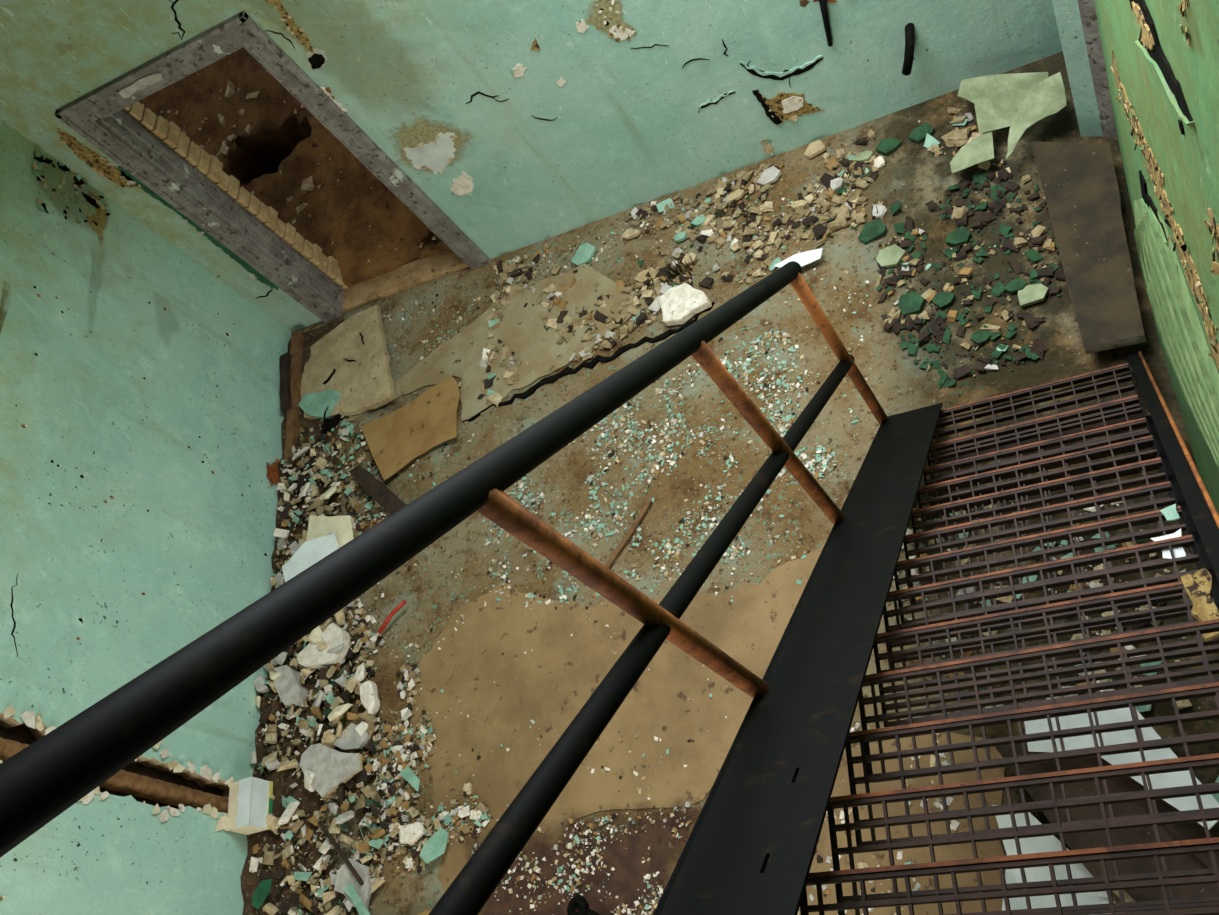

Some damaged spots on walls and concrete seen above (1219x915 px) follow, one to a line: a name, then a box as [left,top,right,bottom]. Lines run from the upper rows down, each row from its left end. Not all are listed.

crack [169,0,185,39]
peeling [608,24,635,42]
crack [466,91,558,121]
crack [630,39,824,113]
spalling [752,90,824,125]
peeling [403,132,474,197]
peeling [31,128,280,290]
peeling [1110,50,1219,372]
spalling [0,705,56,745]
spalling [79,740,234,832]